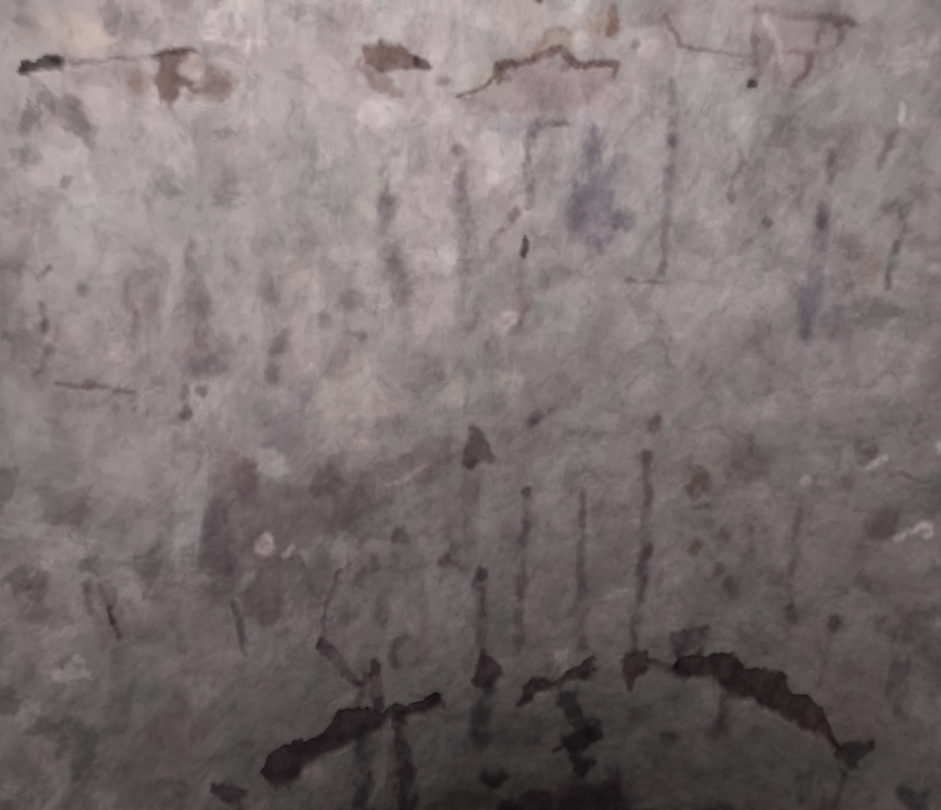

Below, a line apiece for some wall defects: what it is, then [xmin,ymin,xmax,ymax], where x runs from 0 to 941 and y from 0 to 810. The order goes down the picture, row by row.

crack [15,51,156,81]
peeling [453,20,665,129]
damp [520,404,546,432]
damp [191,410,744,810]
damp [679,422,788,606]
damp [779,488,810,629]
damp [813,609,848,692]